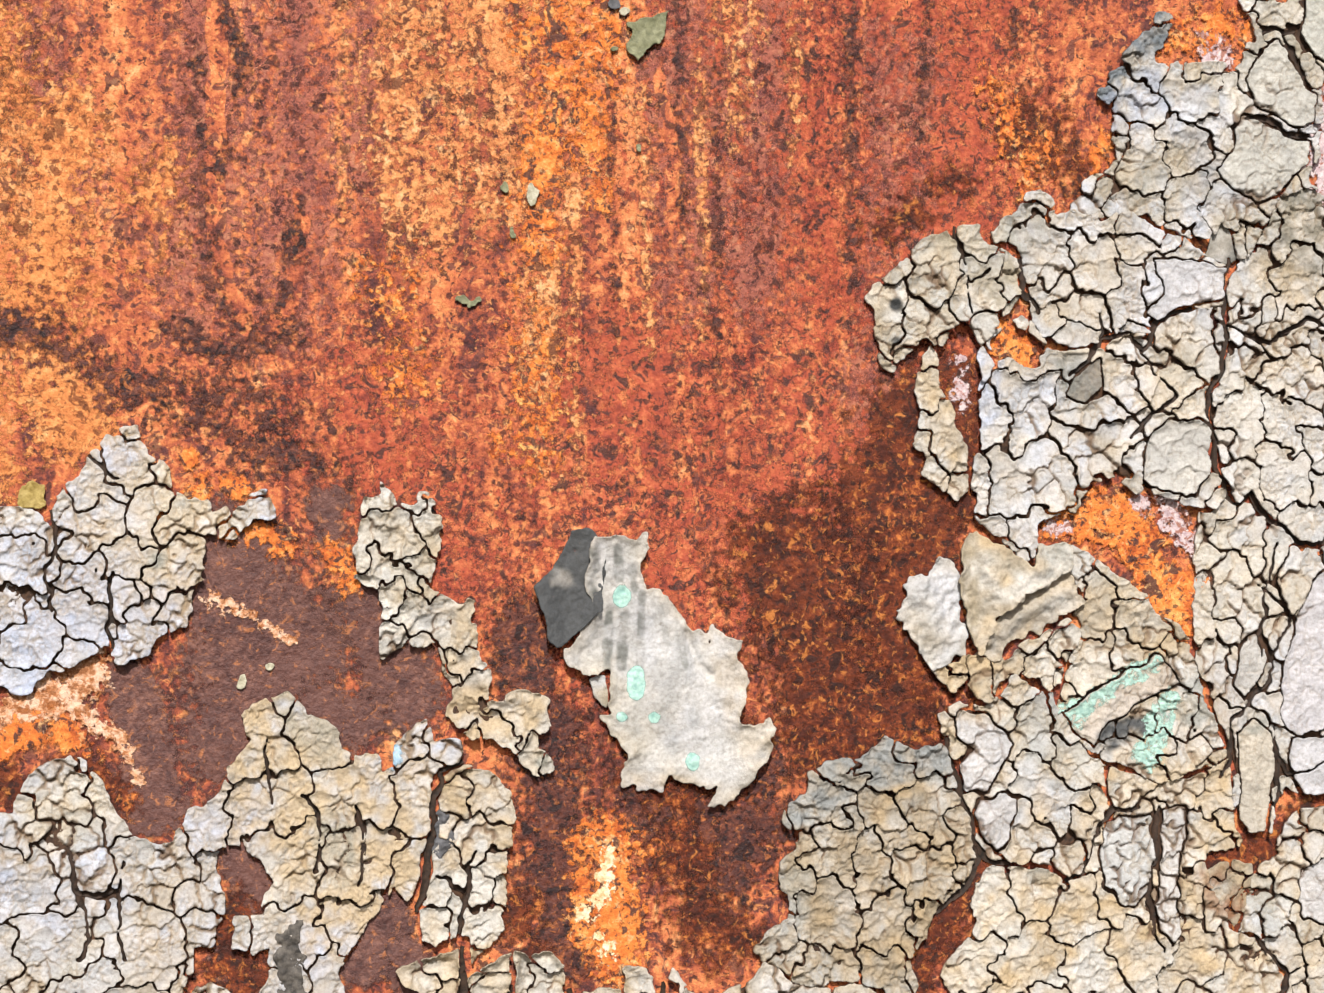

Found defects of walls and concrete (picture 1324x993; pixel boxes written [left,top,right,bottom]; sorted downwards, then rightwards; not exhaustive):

peeling [0,425,276,696]
peeling [722,0,1324,993]
corrosion [1039,472,1210,654]
crack [1069,259,1324,808]
peeling [0,481,565,993]
crack [66,847,126,962]
corrosion [176,834,276,993]
corrosion [338,883,433,993]
crack [414,759,477,993]
peeling [583,965,694,993]
crack [1064,805,1164,949]
corrosion [1200,793,1324,937]